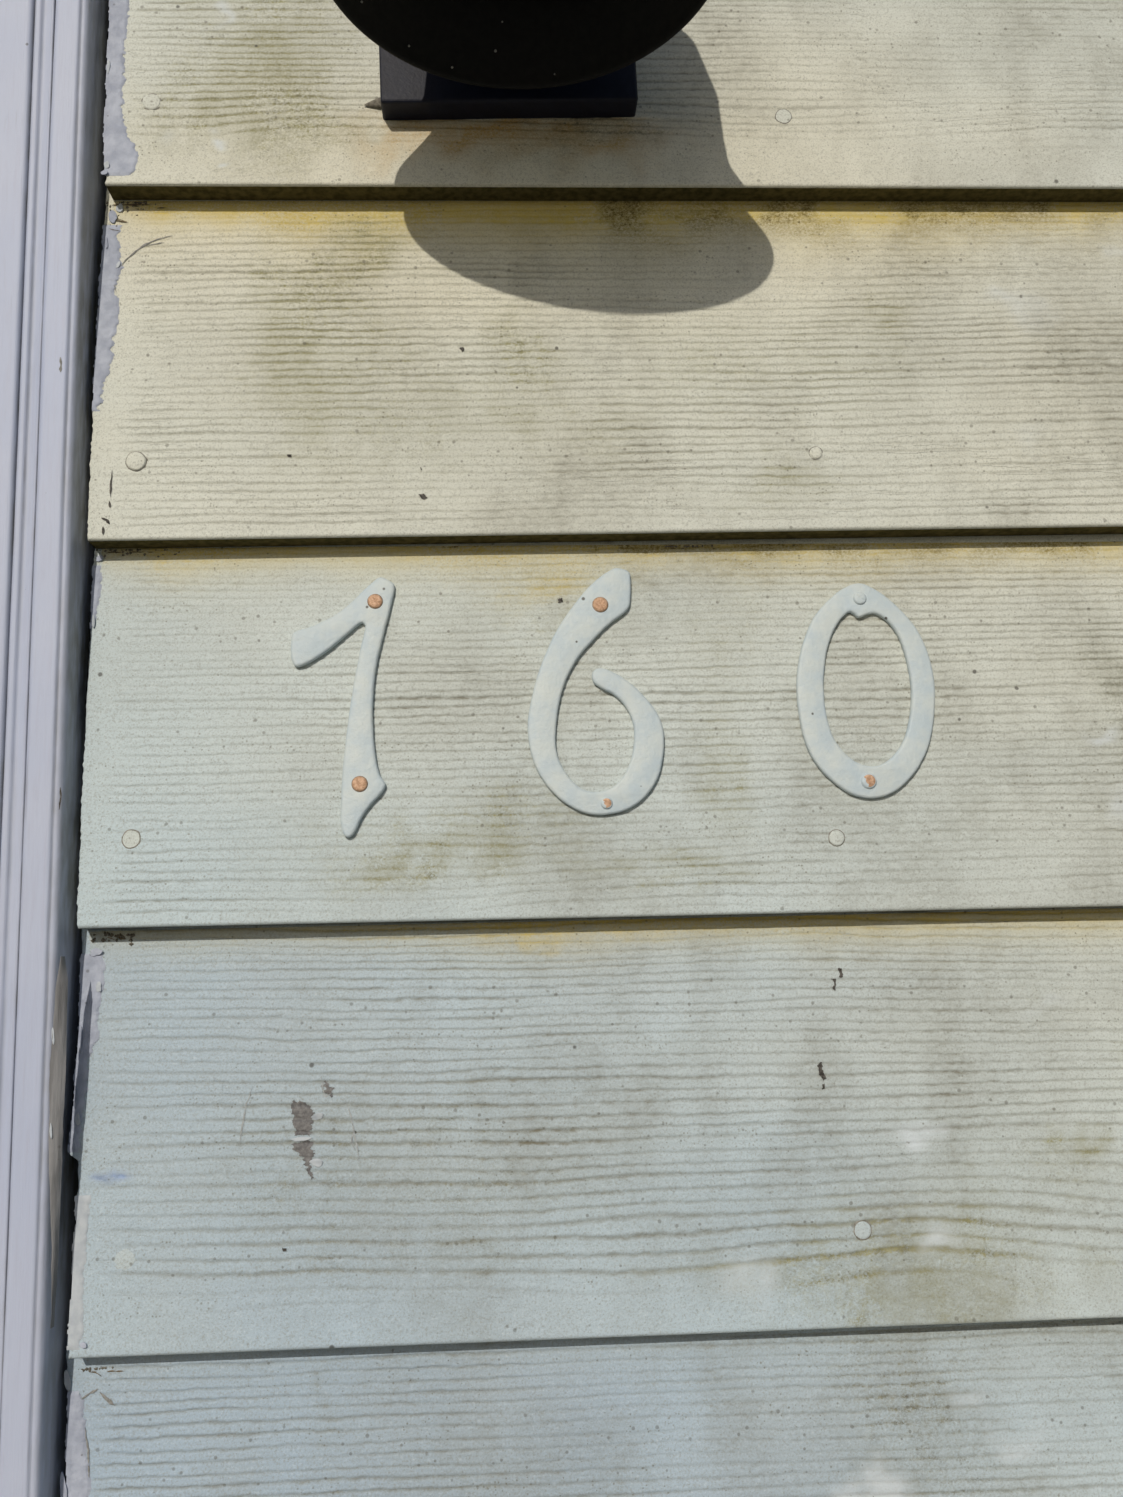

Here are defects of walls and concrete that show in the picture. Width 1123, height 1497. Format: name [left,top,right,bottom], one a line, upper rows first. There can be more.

damp [105,0,1123,530]
damp [93,548,248,576]
damp [211,545,854,962]
damp [990,583,1123,825]
peeling [291,1076,359,1180]